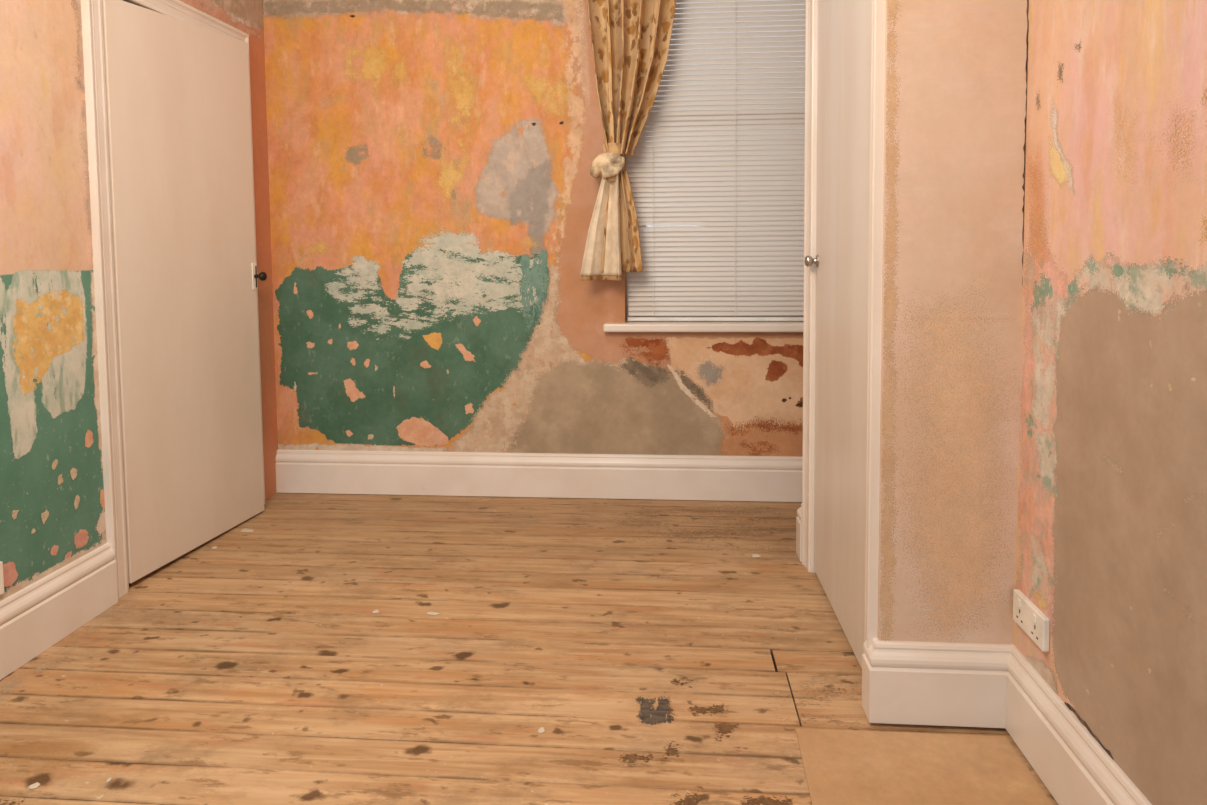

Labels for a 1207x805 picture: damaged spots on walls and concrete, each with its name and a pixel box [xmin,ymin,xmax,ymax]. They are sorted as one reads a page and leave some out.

peeling [3,561,18,587]
peeling [0,0,106,559]
peeling [180,0,587,447]
peeling [1016,240,1207,633]